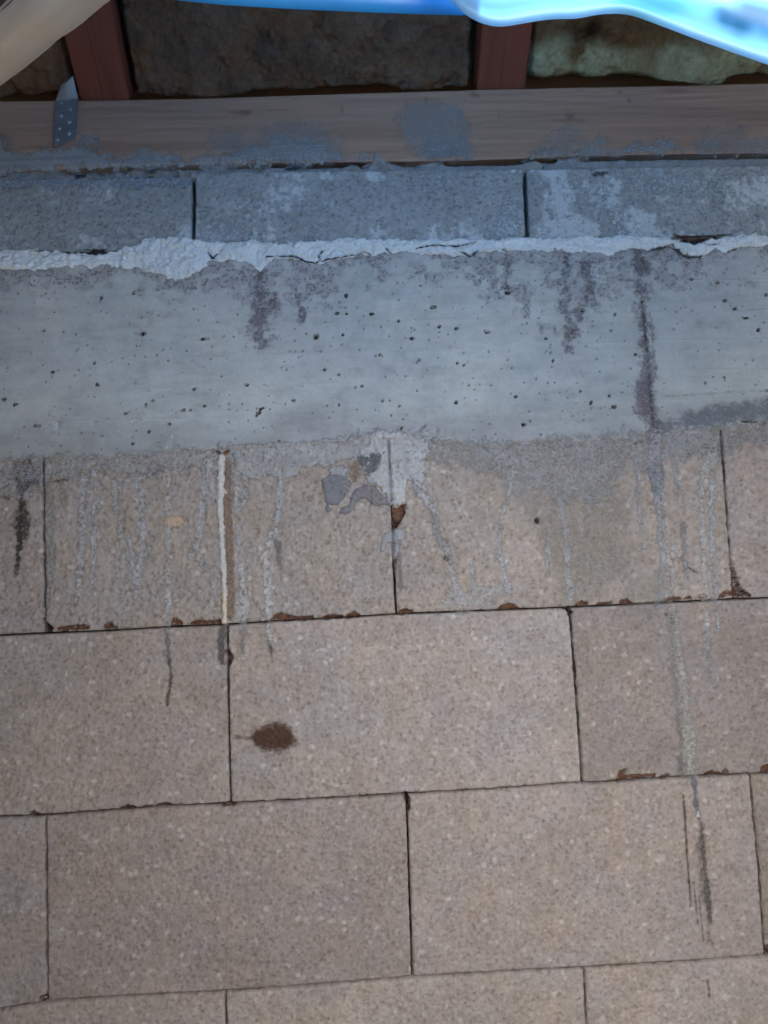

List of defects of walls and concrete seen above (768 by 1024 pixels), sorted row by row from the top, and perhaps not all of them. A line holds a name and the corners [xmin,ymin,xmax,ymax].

crack [266,243,478,264]
water stain [0,433,373,706]
peeling [339,463,407,528]
water stain [411,248,768,934]